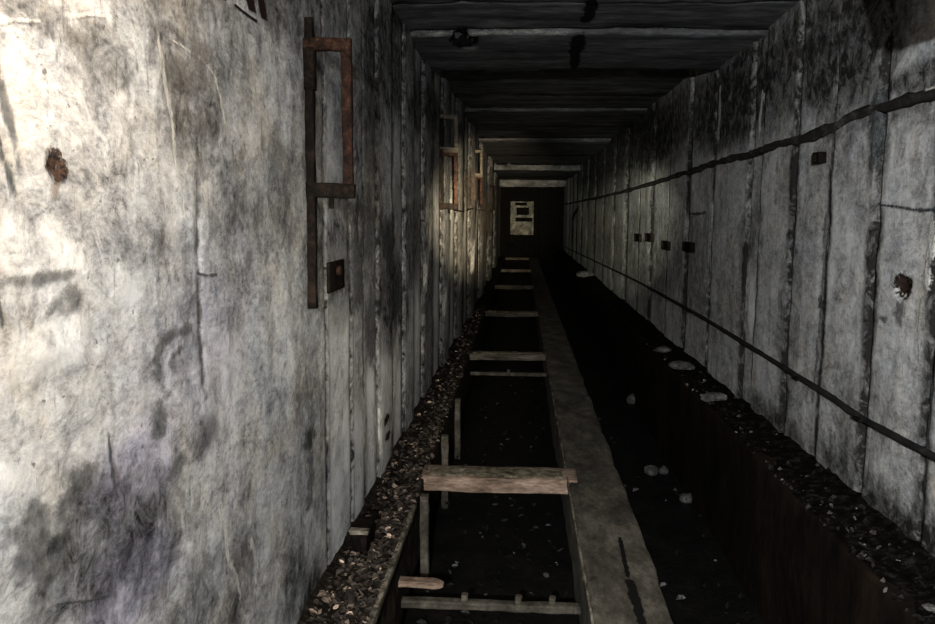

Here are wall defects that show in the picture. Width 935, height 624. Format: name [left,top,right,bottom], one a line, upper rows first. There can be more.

water stain [0,79,20,197]
rust [45,144,69,199]
water stain [157,37,178,174]
peeling [811,214,828,402]
peeling [879,213,935,365]
water stain [6,462,95,595]
water stain [152,399,166,438]
water stain [173,454,183,475]